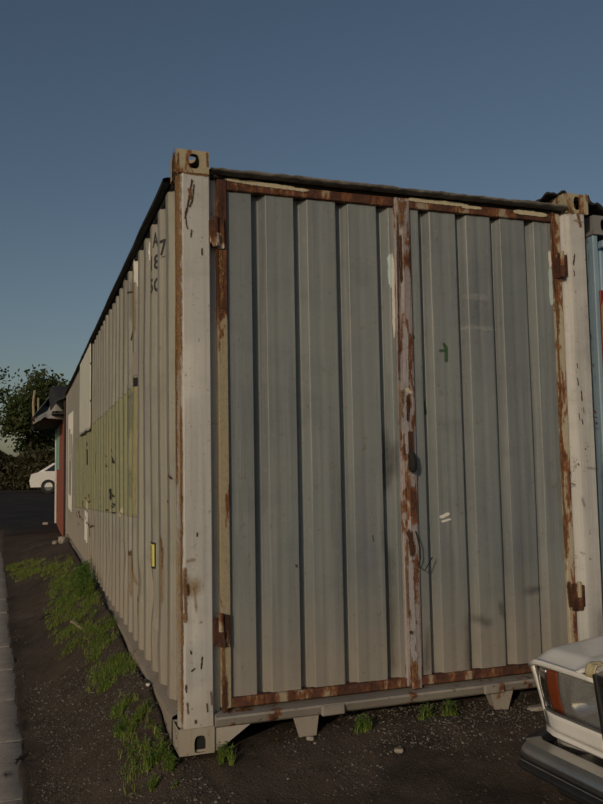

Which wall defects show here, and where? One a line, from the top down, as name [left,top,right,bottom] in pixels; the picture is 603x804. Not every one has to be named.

rust [172,149,209,728]
rust [396,201,412,449]
rust [405,530,417,635]
rust [551,210,567,558]